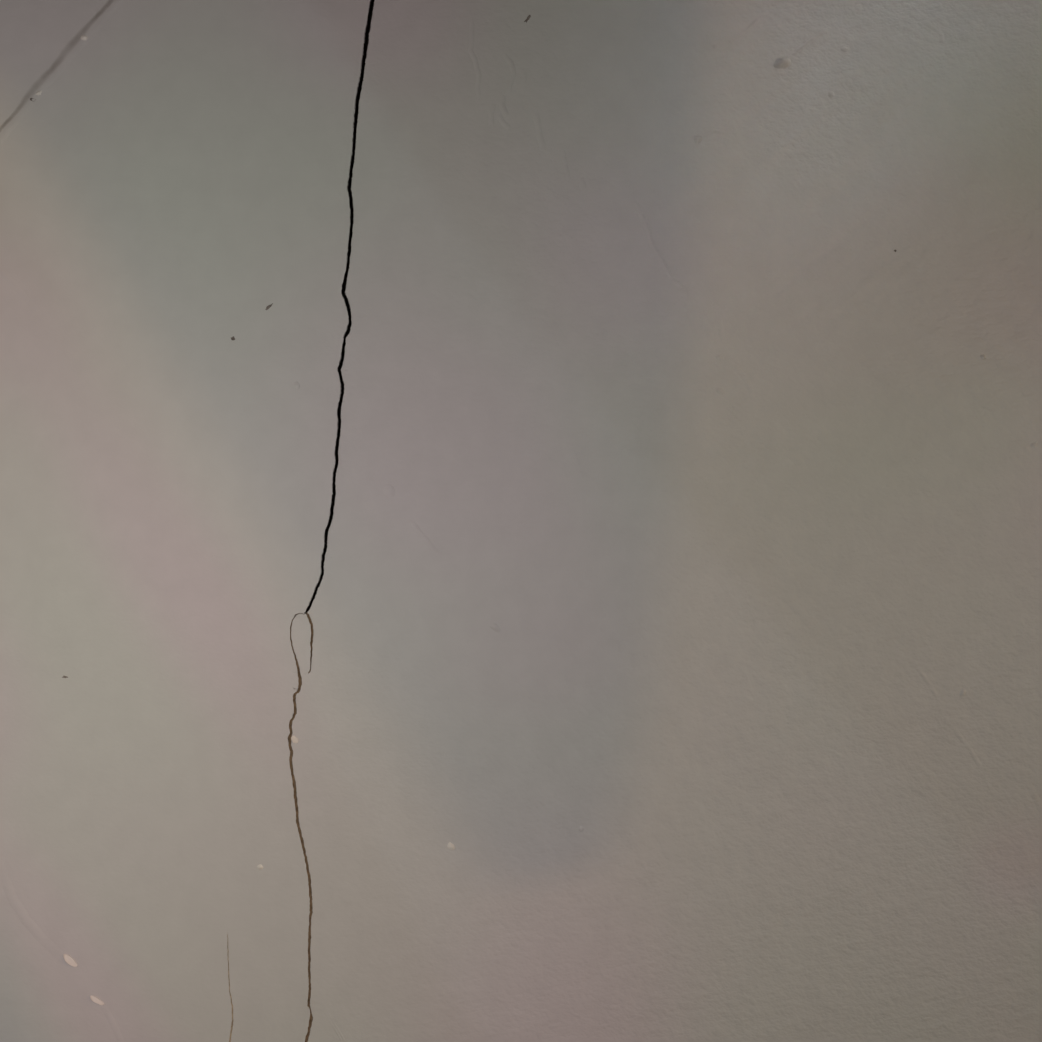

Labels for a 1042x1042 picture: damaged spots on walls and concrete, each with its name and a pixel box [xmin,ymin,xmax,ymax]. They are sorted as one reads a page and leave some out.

crack [280,0,382,1042]